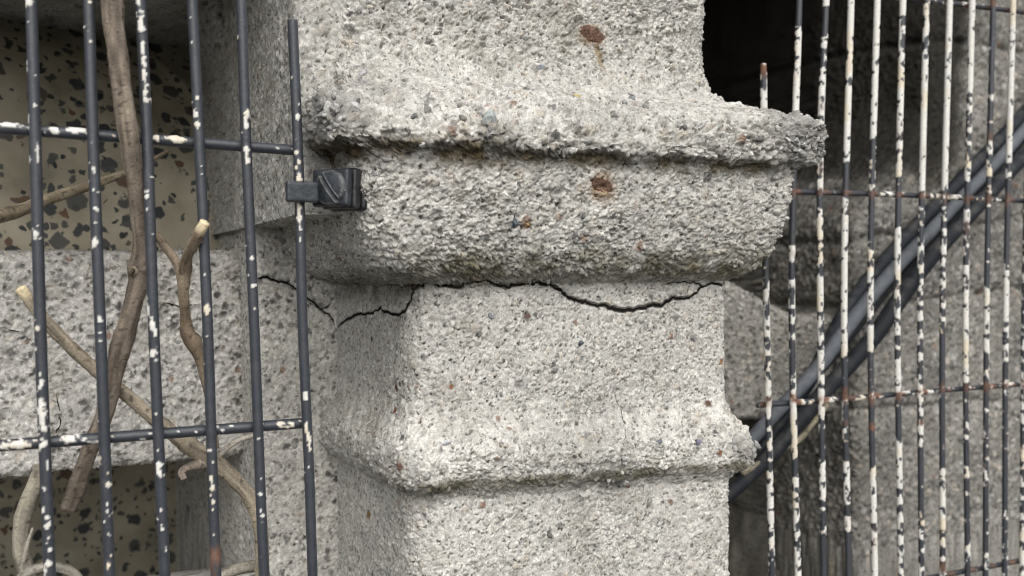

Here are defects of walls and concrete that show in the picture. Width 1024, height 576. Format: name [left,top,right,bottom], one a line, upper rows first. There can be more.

corrosion [579,25,604,64]
corrosion [591,177,613,197]
crack [257,276,722,328]